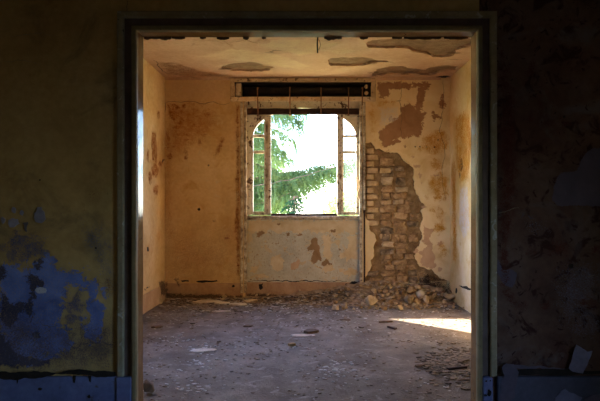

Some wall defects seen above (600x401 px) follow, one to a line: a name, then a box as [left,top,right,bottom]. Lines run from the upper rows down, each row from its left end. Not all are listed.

spalling [192,37,471,286]
damp [418,110,471,257]
peeling [0,252,116,383]